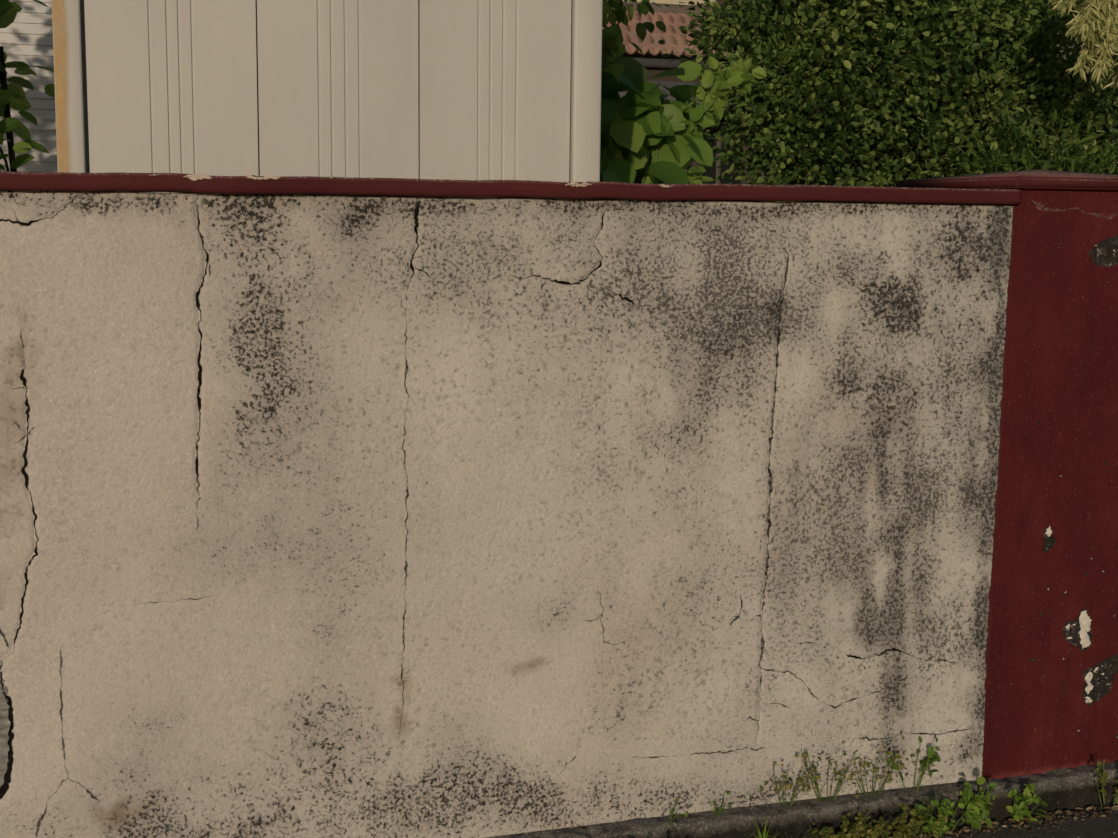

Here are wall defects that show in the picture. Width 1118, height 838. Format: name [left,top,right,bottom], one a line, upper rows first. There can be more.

crack [495,207,661,318]
peeling [1089,234,1118,267]
crack [195,197,210,528]
crack [0,330,38,799]
crack [35,647,99,838]
crack [398,203,460,740]
damp [0,190,1013,838]
crack [635,226,956,758]
crack [852,727,978,741]
peeling [1042,526,1056,553]
peeling [1063,609,1094,651]
peeling [1082,654,1118,707]